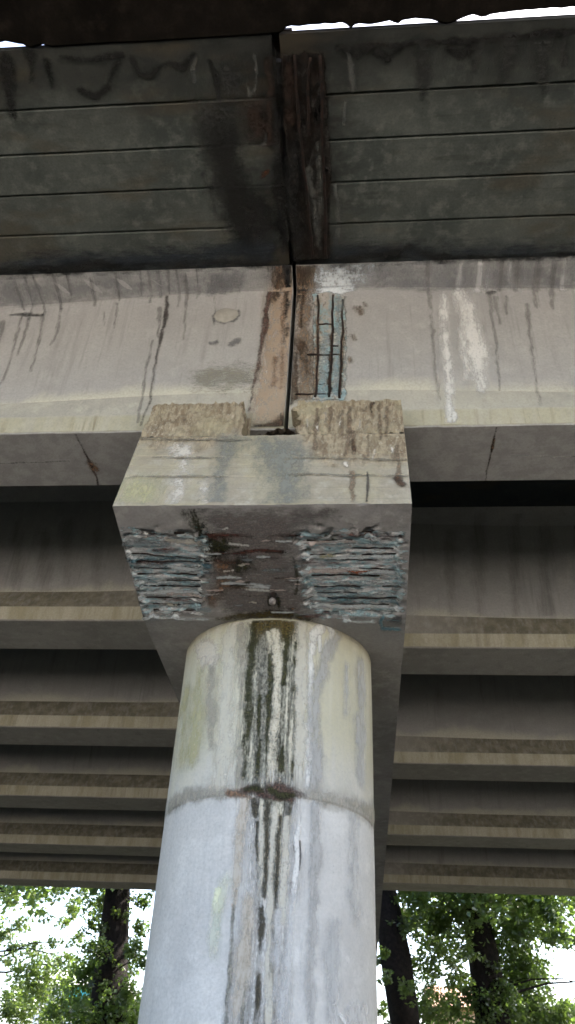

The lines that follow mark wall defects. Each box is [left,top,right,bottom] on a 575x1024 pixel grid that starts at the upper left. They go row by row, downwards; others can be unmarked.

spalling [295,291,347,401]
corrosion [254,265,388,458]
leakage [314,183,575,422]
crack [76,435,99,485]
corrosion [394,445,406,487]
crack [485,427,497,479]
corrosion [204,533,293,604]
spalling [120,526,409,623]
leakage [168,438,375,1024]